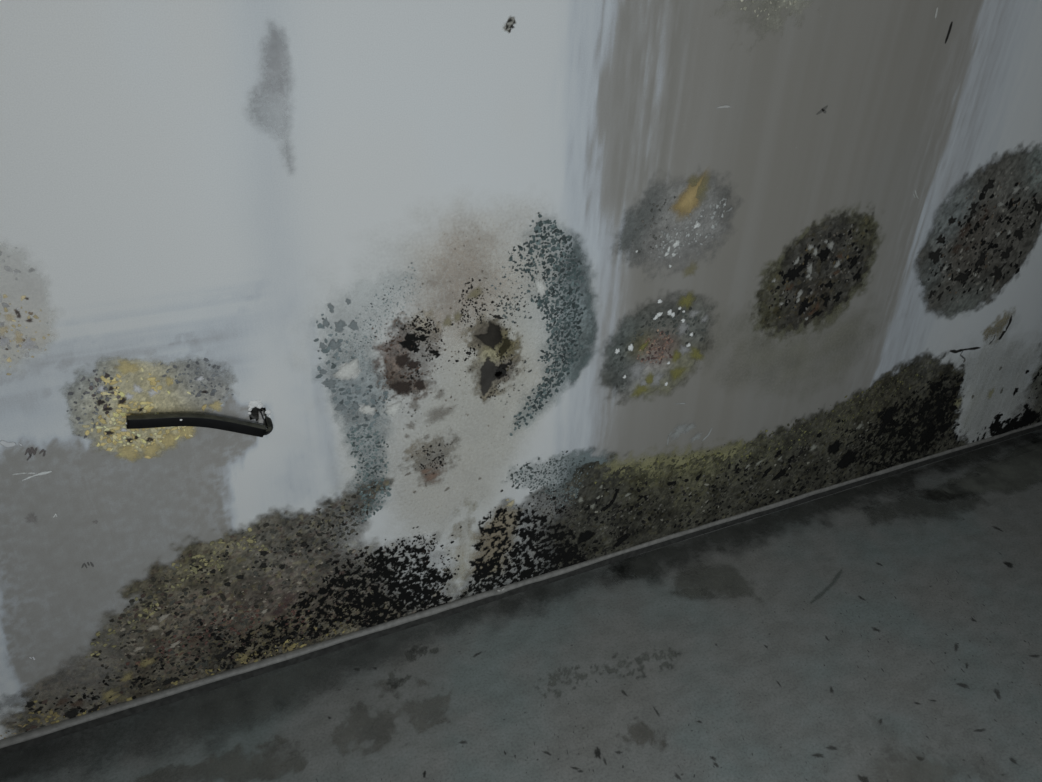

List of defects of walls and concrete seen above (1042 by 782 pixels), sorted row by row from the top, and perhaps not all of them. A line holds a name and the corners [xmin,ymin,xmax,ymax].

leakage [620,177,733,275]
leakage [916,146,1042,318]
leakage [0,212,1042,739]